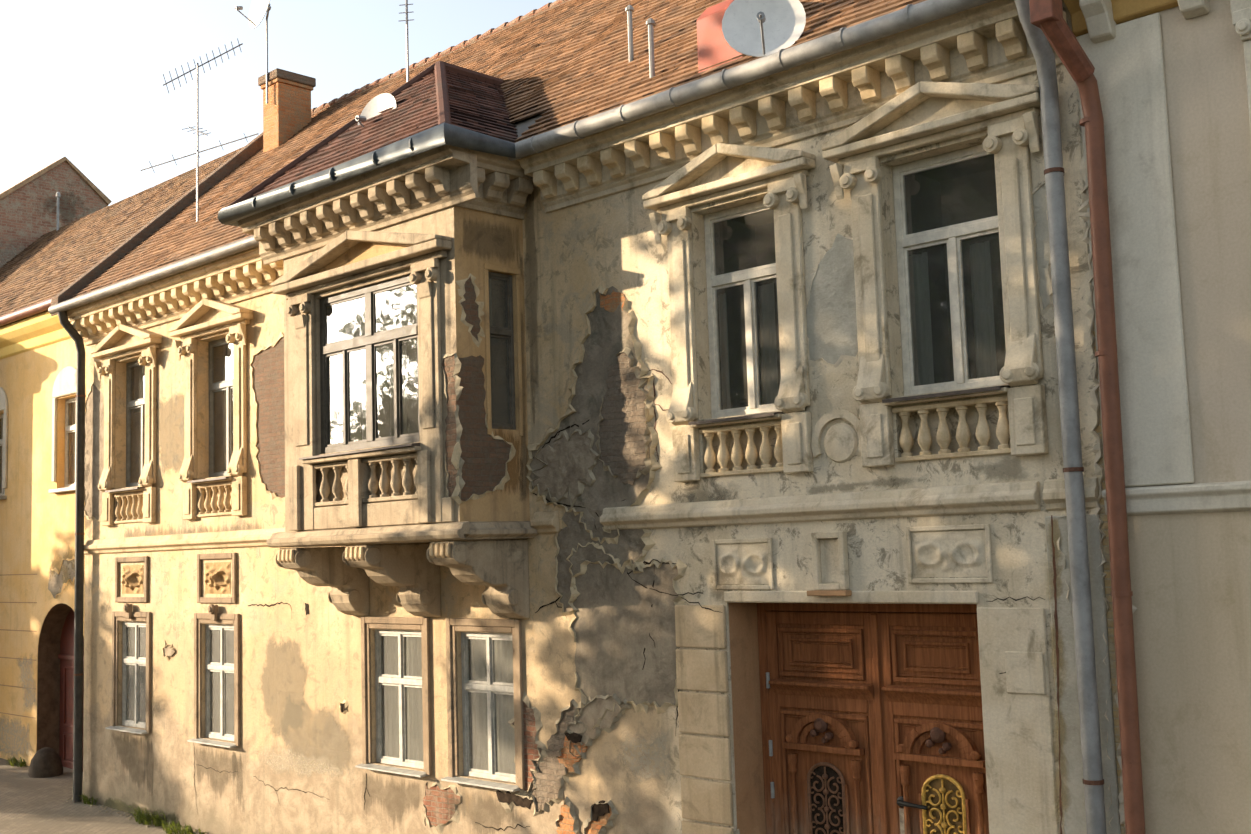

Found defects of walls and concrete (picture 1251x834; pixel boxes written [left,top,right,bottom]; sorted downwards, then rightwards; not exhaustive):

flaking render [250,332,285,503]
crack [533,419,590,458]
crack [649,369,672,462]
crack [533,493,624,528]
flaking render [48,554,75,599]
spalling [441,273,687,834]
crack [535,596,567,618]
crack [618,559,723,670]
flaking render [423,780,462,834]